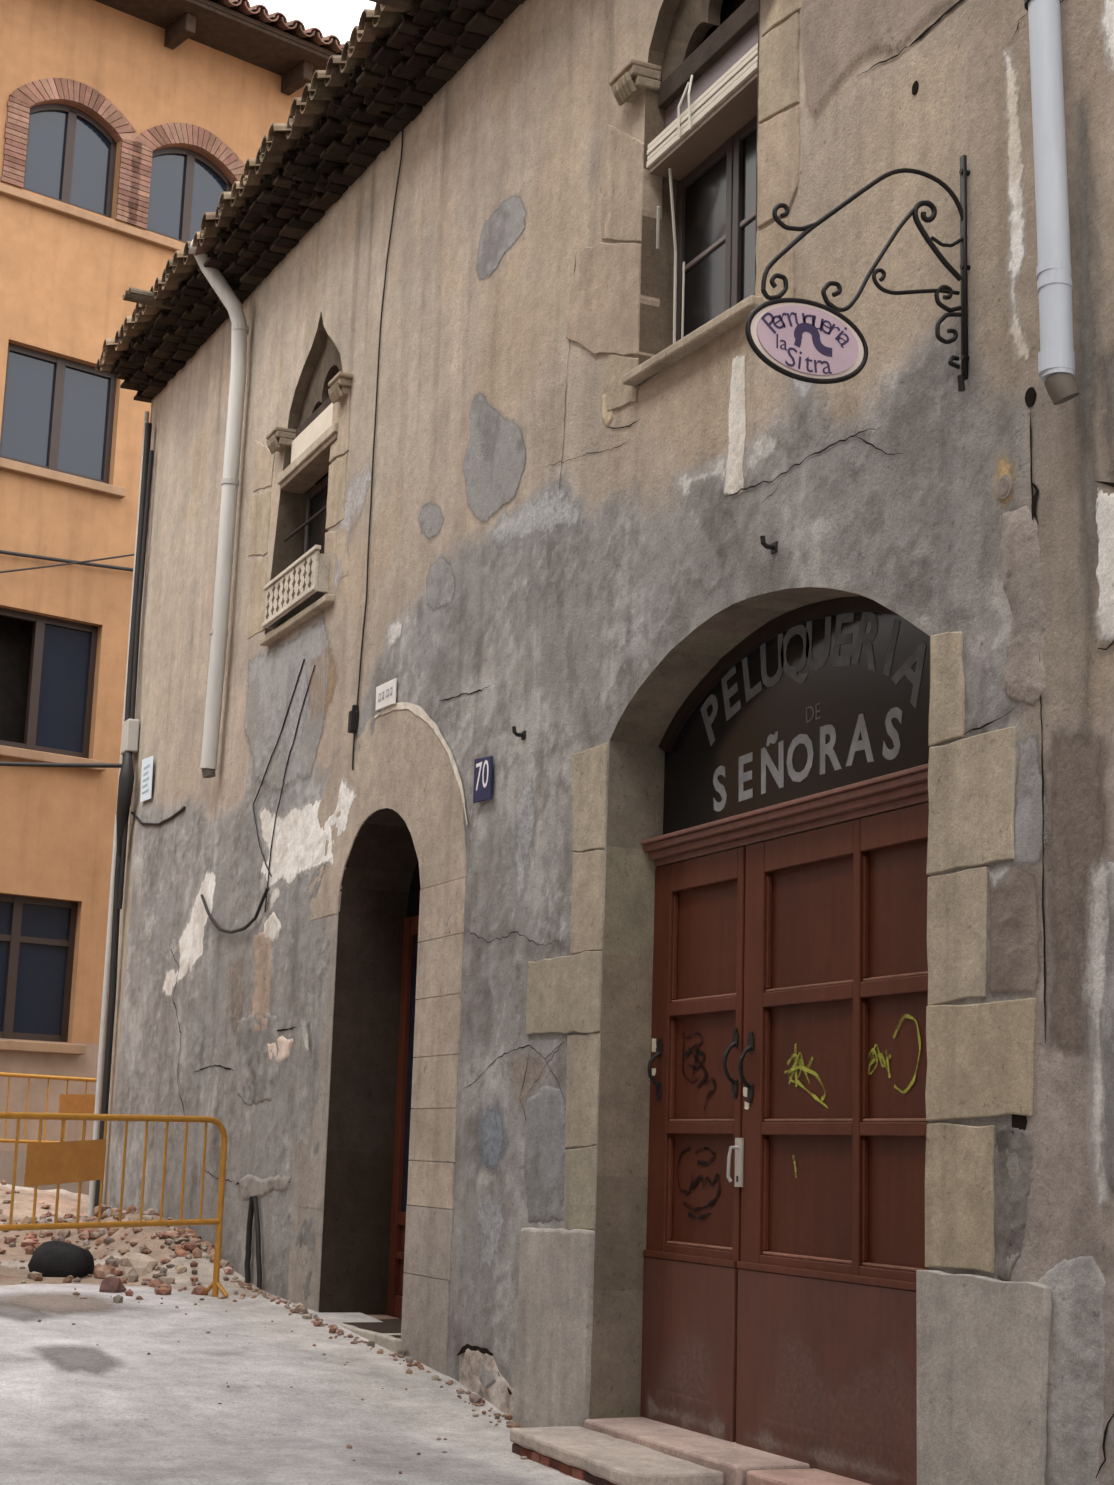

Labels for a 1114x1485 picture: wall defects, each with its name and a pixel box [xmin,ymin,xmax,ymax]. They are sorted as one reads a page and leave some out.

crack [857,0,963,77]
leakage [1101,0,1114,70]
leakage [1004,52,1029,361]
leakage [1076,101,1114,630]
crack [724,427,904,504]
peeling [1096,481,1114,659]
peeling [141,872,216,996]
peeling [229,777,356,1062]
leakage [989,701,1109,1205]